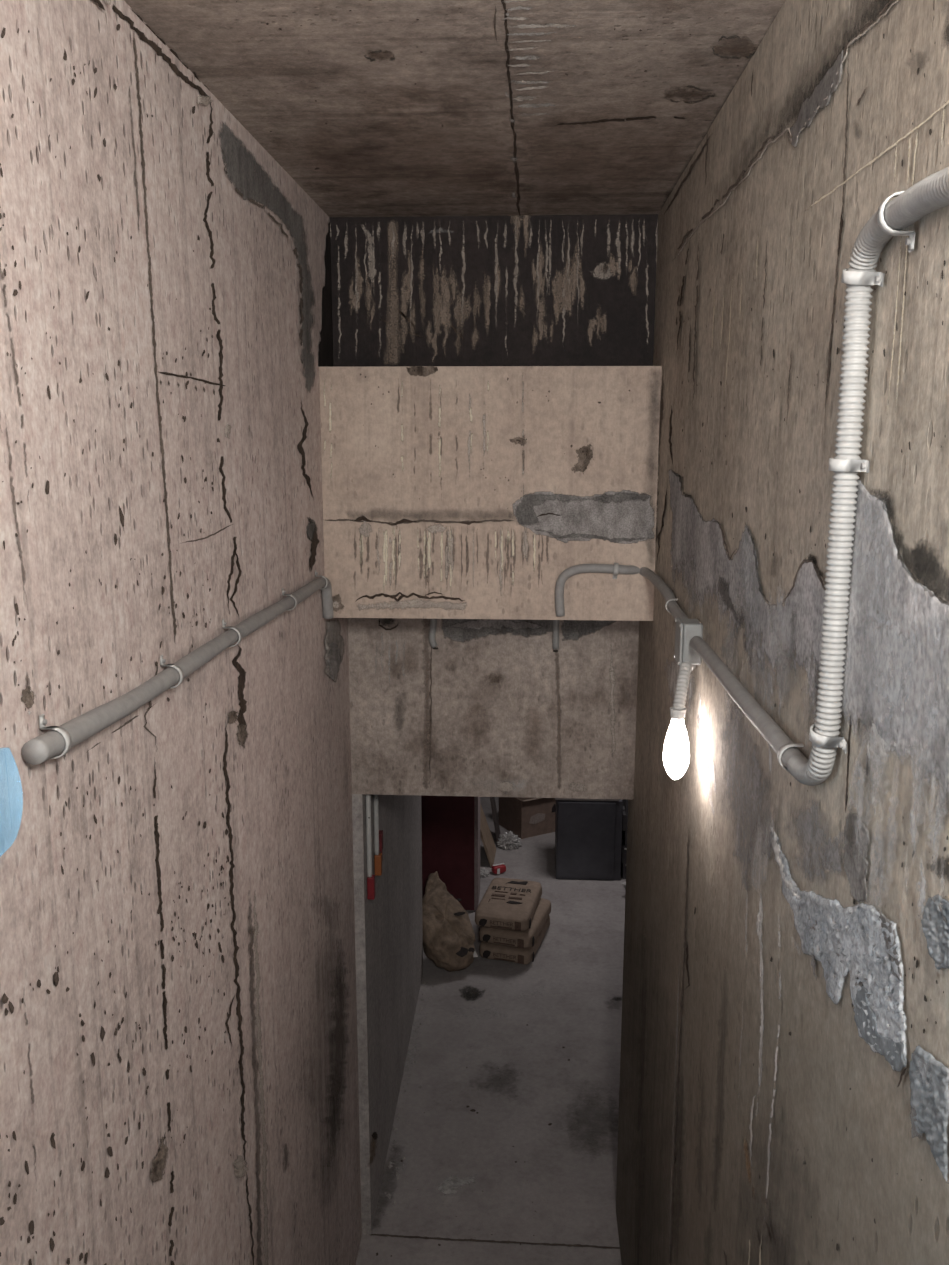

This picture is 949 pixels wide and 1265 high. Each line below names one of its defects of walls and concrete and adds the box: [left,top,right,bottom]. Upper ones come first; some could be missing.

crack [494,0,521,216]
water stain [330,220,658,350]
crack [91,0,254,1265]
crack [356,592,467,610]